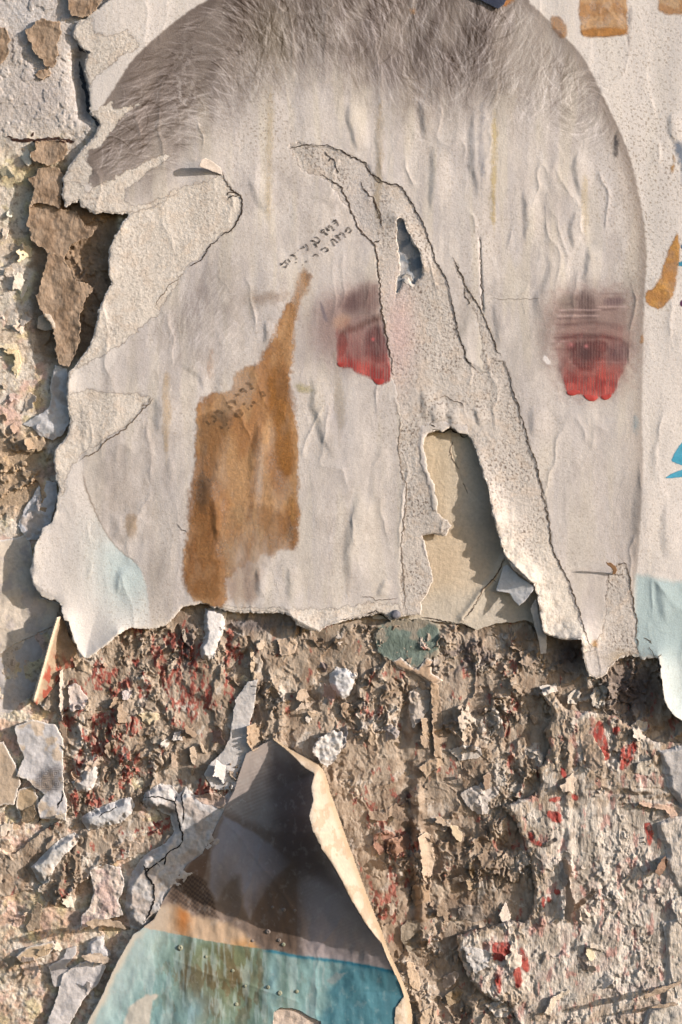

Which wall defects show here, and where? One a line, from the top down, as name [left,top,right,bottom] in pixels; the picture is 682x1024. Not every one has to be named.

peeling [25,0,139,87]
crack [155,172,243,306]
peeling [0,388,147,496]
peeling [221,142,640,708]
crack [291,144,592,647]
peeling [58,657,108,721]
peeling [160,725,227,809]
peeling [295,661,400,749]
peeling [408,681,529,779]
peeling [368,772,513,929]
peeling [558,858,597,925]
peeling [416,947,490,1024]